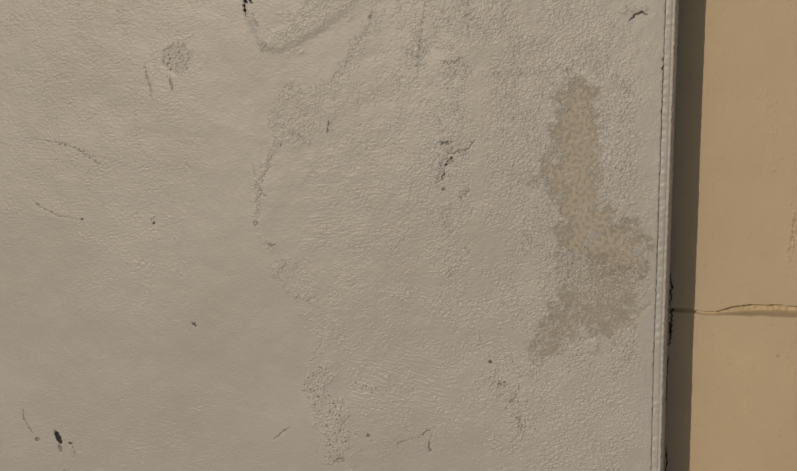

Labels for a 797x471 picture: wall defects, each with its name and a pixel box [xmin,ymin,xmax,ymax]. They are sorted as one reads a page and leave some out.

crack [241,0,255,23]
peeling [435,141,473,191]